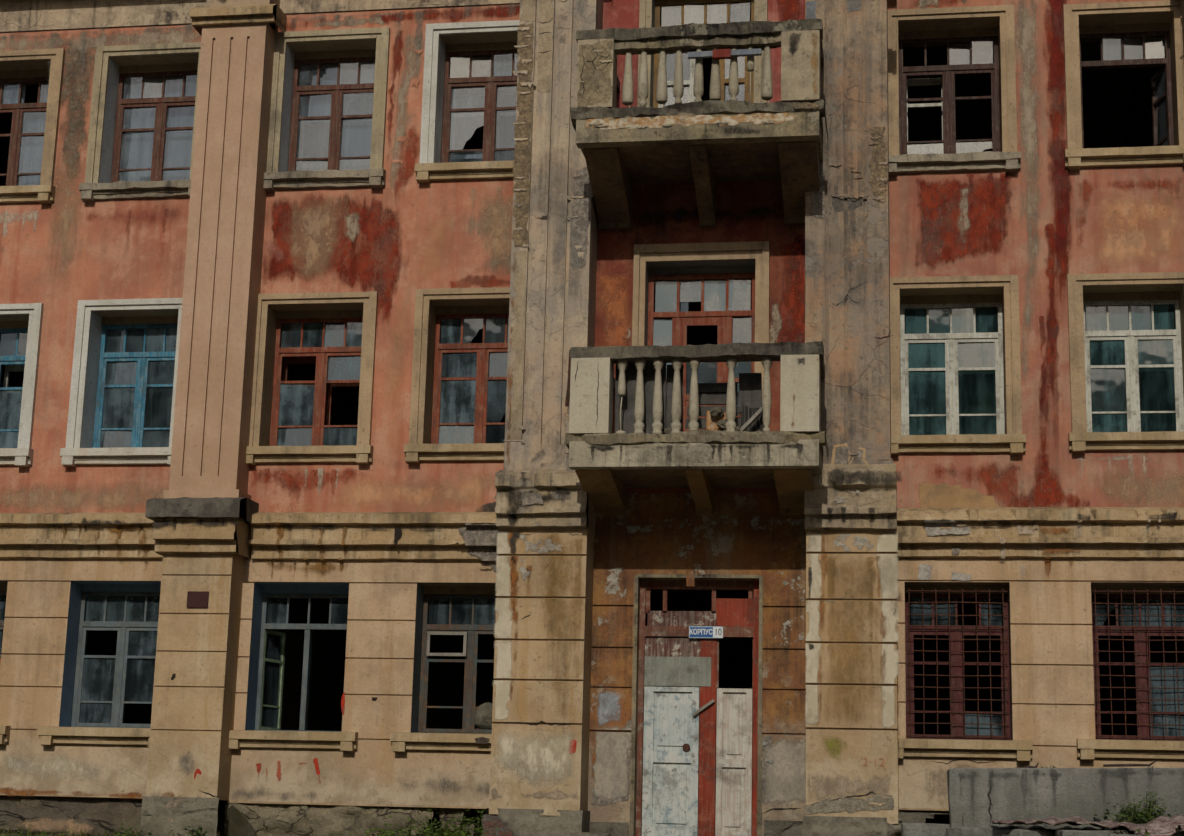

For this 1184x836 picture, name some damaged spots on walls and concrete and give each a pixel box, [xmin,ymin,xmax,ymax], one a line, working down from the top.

peeling [586,102,820,130]
peeling [512,23,593,295]
peeling [455,489,499,578]
peeling [519,533,578,580]
damp [827,470,902,519]
damp [918,464,1035,562]
peeling [601,567,627,600]
damp [805,533,899,727]
damp [764,739,889,803]
crack [0,810,43,832]
crack [962,778,993,826]